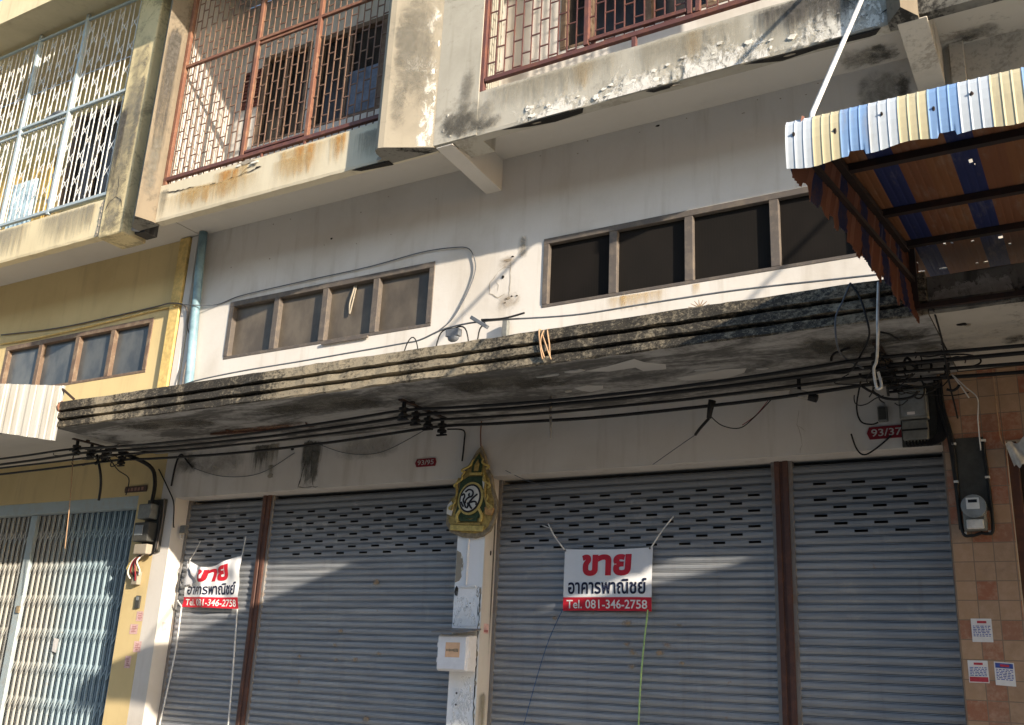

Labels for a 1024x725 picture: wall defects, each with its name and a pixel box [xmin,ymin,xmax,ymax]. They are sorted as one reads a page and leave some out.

peeling [503,0,884,130]
peeling [408,58,436,146]
damp [869,75,908,101]
damp [442,108,494,137]
damp [301,441,321,479]